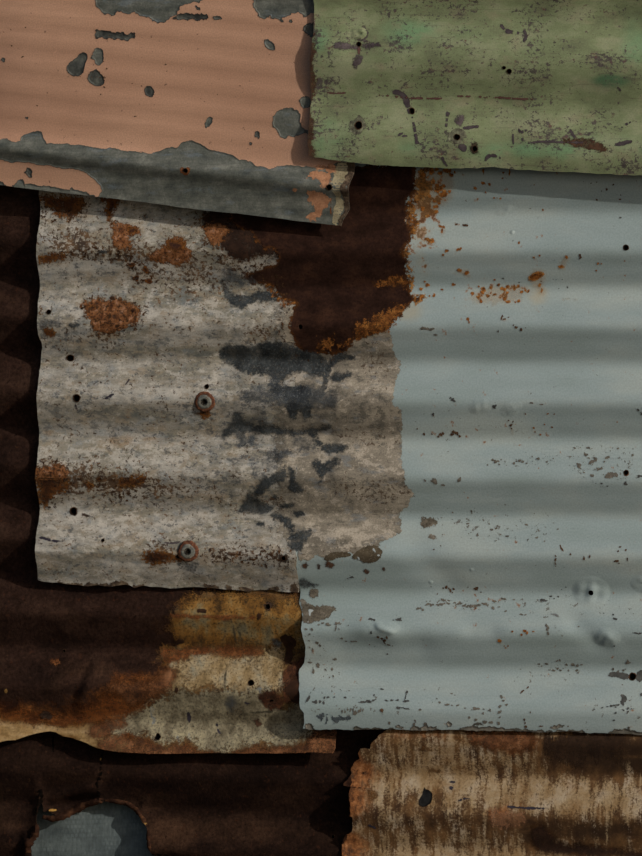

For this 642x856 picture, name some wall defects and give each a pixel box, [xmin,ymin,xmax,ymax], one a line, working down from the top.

peeling [95,0,222,23]
peeling [253,0,314,37]
peeling [67,29,136,86]
peeling [272,96,311,139]
peeling [563,137,632,153]
peeling [0,131,355,225]
corrosion [38,164,468,363]
corrosion [471,271,568,303]
corrosion [35,452,149,516]
corrosion [0,588,337,760]
corrosion [465,730,626,769]
corrosion [530,824,642,856]